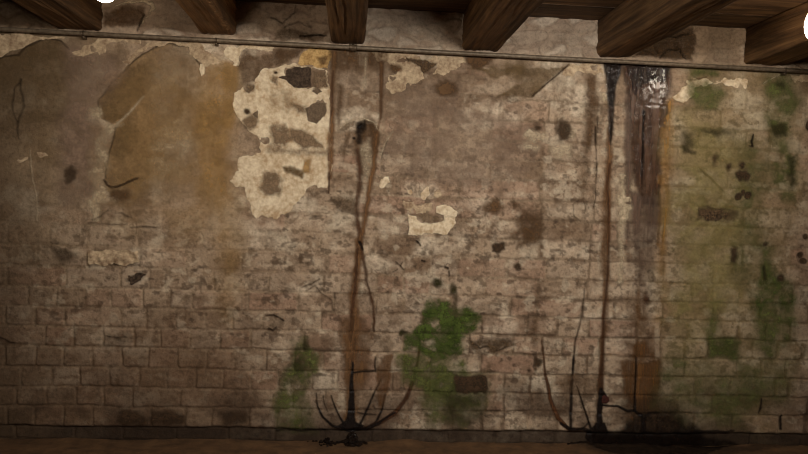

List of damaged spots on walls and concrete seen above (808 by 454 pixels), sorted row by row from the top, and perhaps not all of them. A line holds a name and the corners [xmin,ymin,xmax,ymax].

peeling [0,32,65,57]
peeling [72,0,274,221]
peeling [230,13,333,220]
peeling [369,51,466,94]
corrosion [341,115,381,420]
peeling [402,186,458,236]
leakage [586,63,671,393]
leakage [727,162,751,200]
crack [276,346,420,432]
leakage [449,375,488,411]
crack [541,306,659,443]
leakage [594,333,735,447]